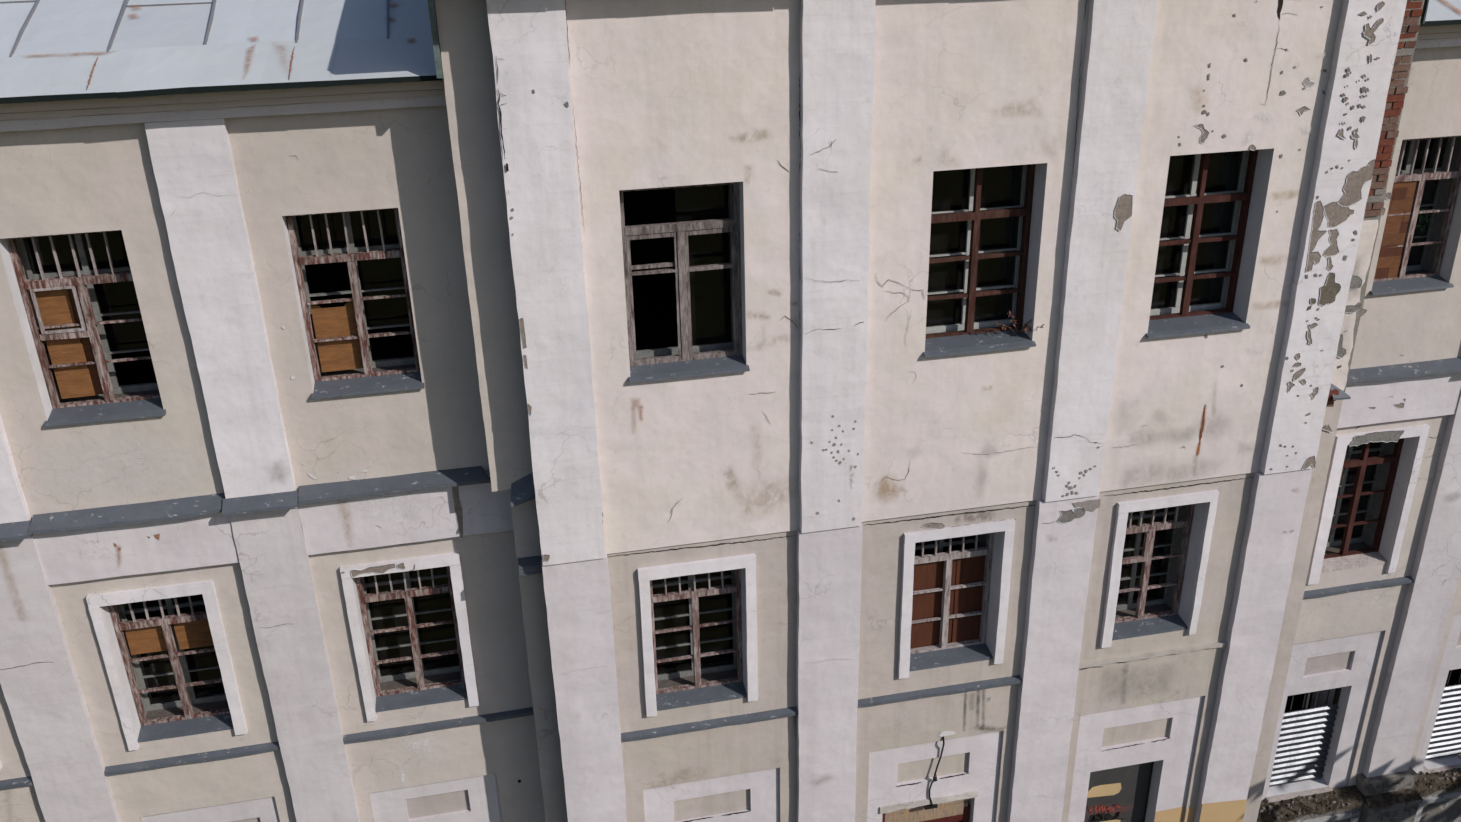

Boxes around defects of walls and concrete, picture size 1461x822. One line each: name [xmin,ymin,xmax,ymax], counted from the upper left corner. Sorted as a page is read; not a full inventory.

crack [1263,0,1296,105]
spalling [1114,194,1133,231]
flaking render [1280,0,1423,432]
crack [804,277,925,381]
spalling [1046,425,1146,524]
spalling [1271,444,1316,470]